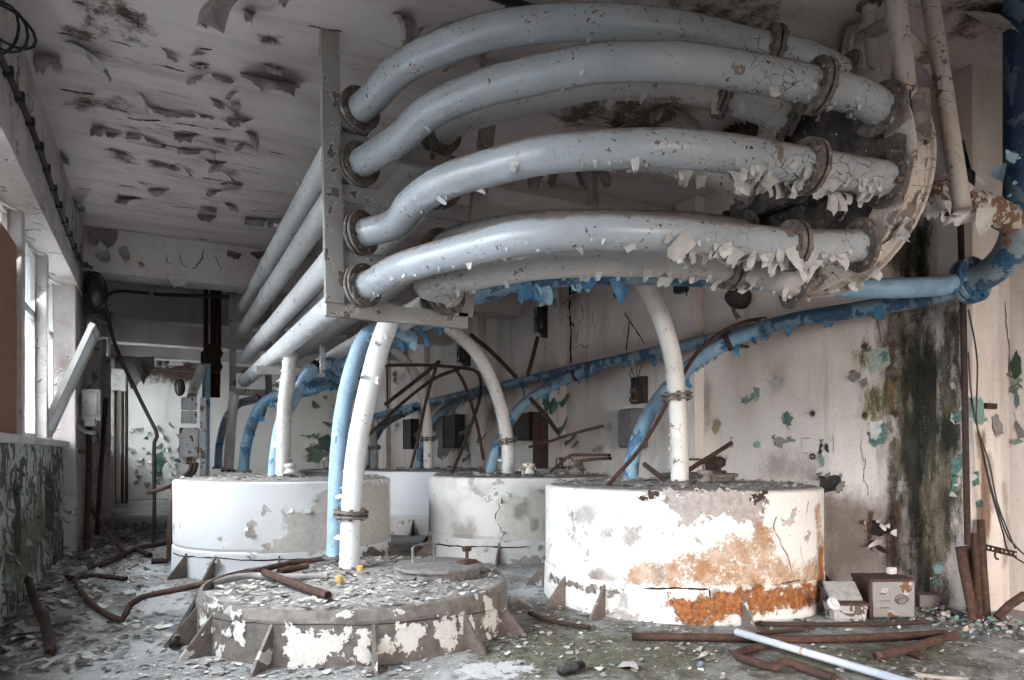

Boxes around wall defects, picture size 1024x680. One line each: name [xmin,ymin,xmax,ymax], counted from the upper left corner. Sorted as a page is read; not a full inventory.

peeling [197,0,254,33]
peeling [674,158,884,216]
peeling [87,48,336,443]
peeling [497,230,854,307]
peeling [128,422,182,488]
flaking render [815,439,845,494]
damp [868,317,960,592]
crack [436,504,530,548]
crack [644,587,711,599]
peeling [637,487,769,527]
corrosion [624,503,824,626]
crack [773,517,804,584]